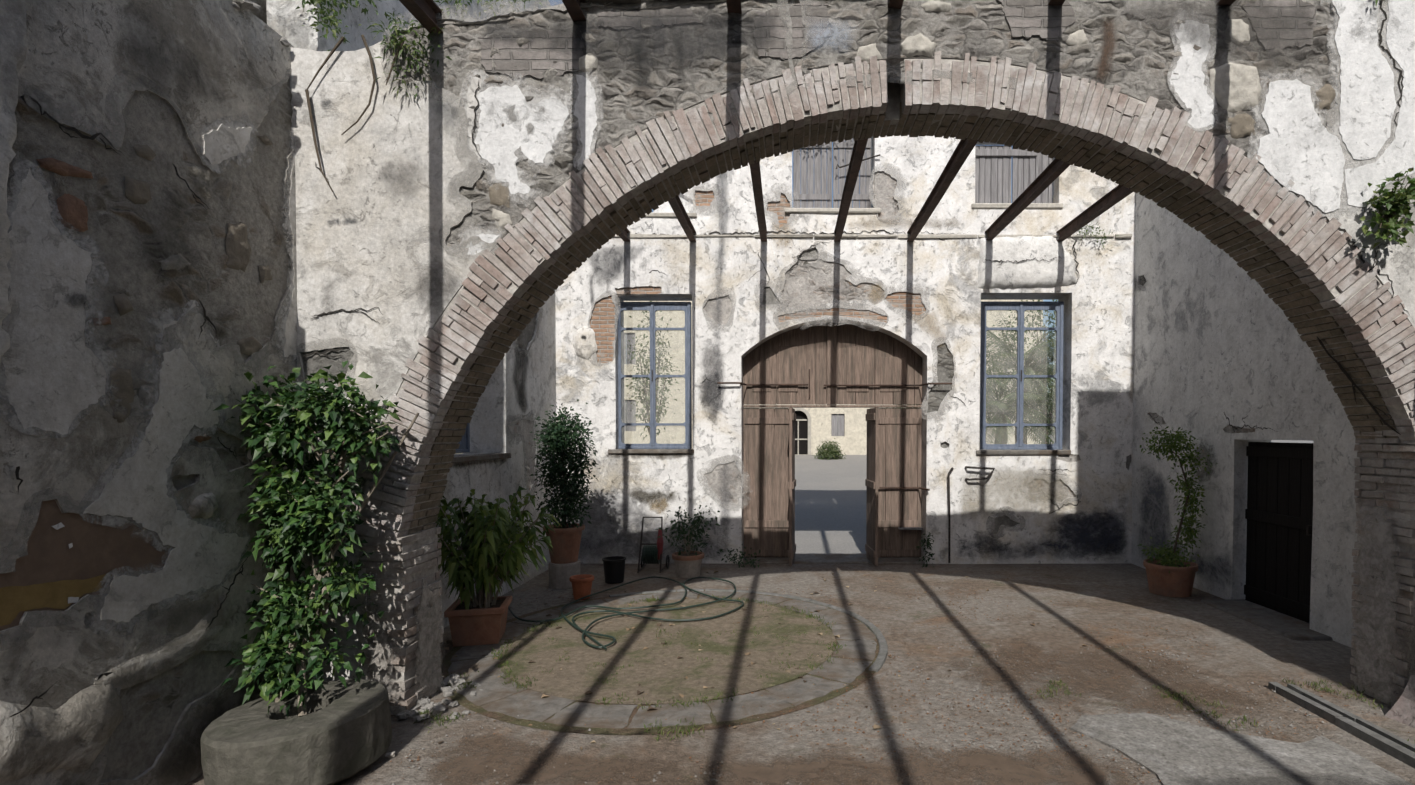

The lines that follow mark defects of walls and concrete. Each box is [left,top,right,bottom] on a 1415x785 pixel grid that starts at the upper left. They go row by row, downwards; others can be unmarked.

crack [1377,0,1404,143]
spalling [381,0,1415,256]
spalling [0,68,357,646]
water stain [514,351,528,412]
spalling [588,286,662,365]
spalling [756,246,929,328]
spalling [922,337,956,421]
water stain [965,475,1058,513]
water stain [1025,471,1231,583]
crack [205,548,255,631]